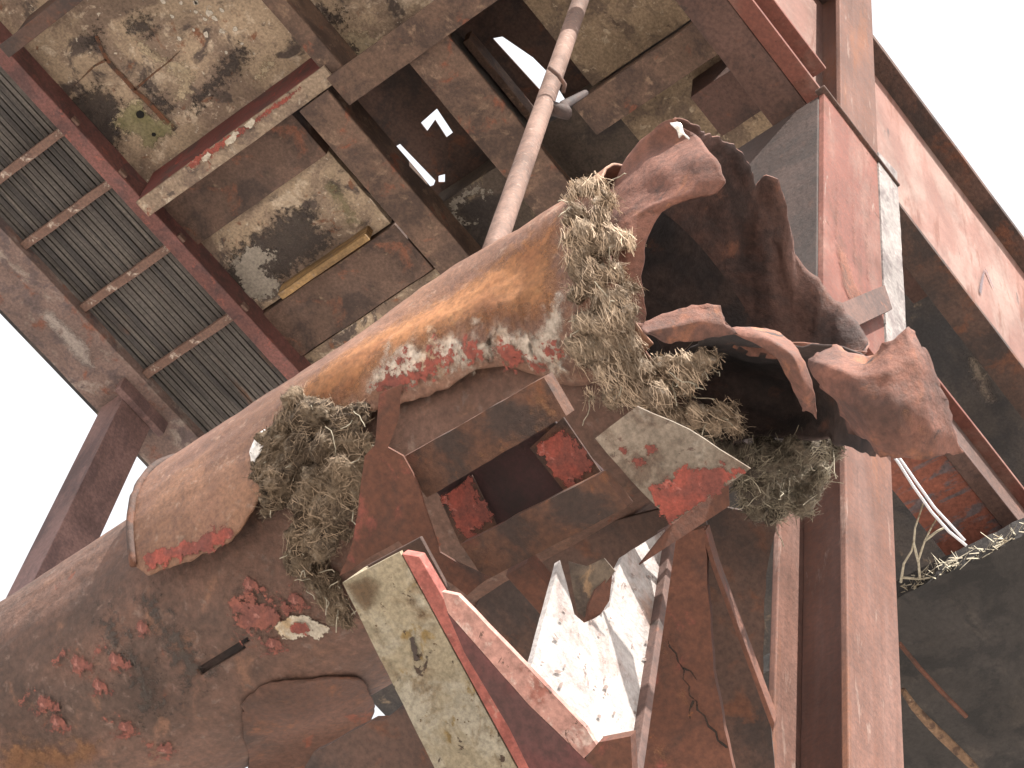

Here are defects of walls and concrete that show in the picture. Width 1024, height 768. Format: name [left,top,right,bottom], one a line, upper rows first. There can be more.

water stain [123,10,159,40]
water stain [72,74,124,154]
water stain [137,79,174,114]
water stain [187,40,254,118]
peeling [186,86,301,169]
water stain [225,204,340,302]
corrosion [302,219,556,403]
peeling [367,293,566,394]
peeling [142,523,235,571]
peeling [227,571,330,657]
crack [541,608,581,688]
crack [642,640,728,748]